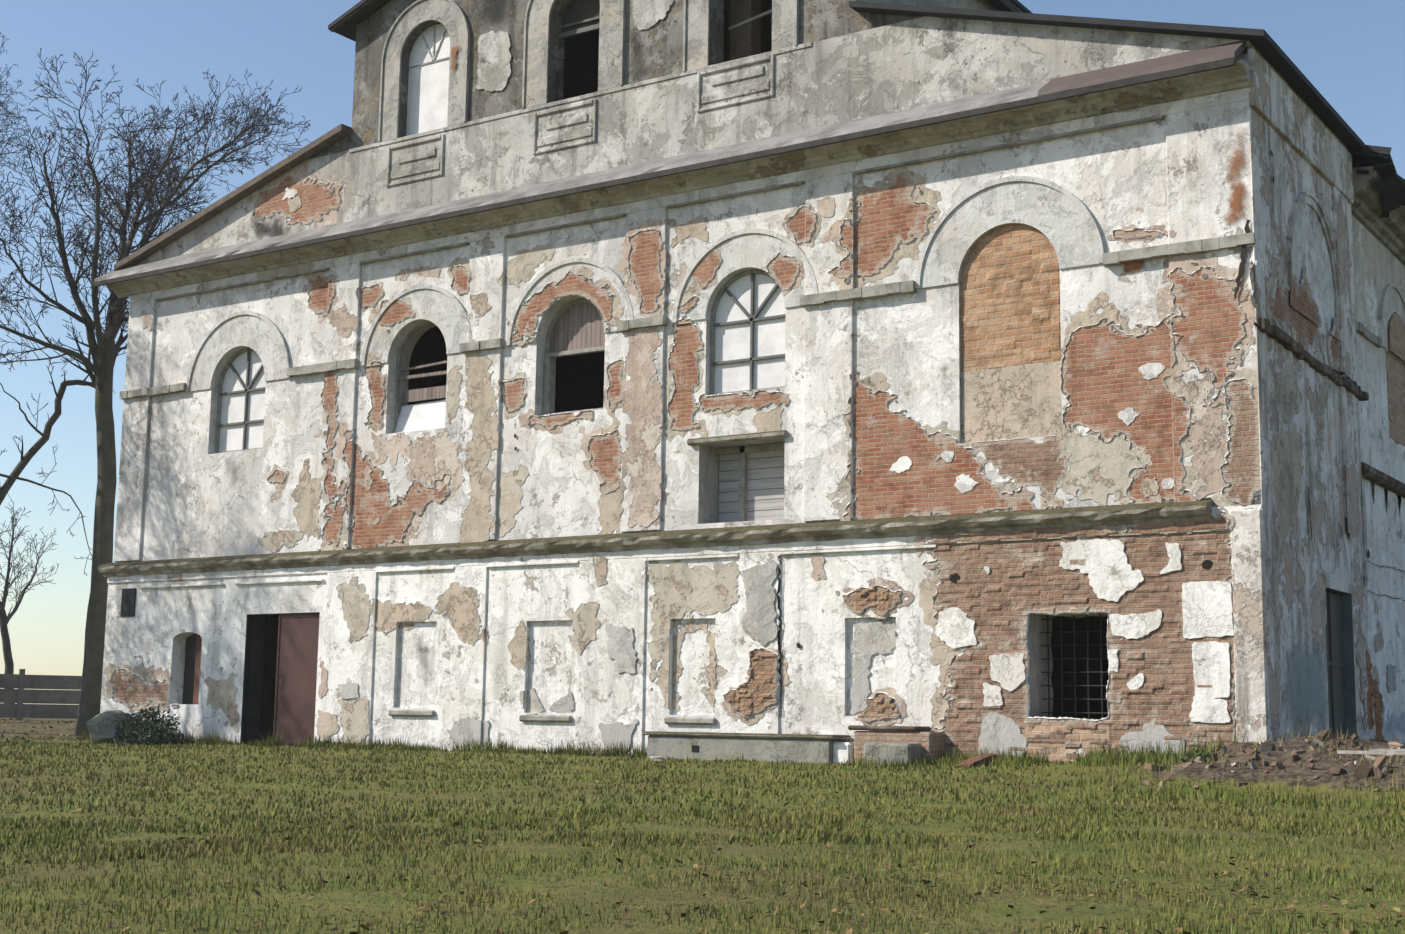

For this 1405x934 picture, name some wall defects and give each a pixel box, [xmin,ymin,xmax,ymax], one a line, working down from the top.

flaking render [245,159,347,229]
flaking render [764,167,945,296]
flaking render [1107,224,1176,242]
flaking render [257,216,791,552]
flaking render [811,252,1343,763]
flaking render [104,655,180,715]
peeling [204,672,240,733]
peeling [336,576,489,646]
peeling [508,620,532,671]
peeling [565,553,608,655]
peeling [642,554,801,726]
spalling [1353,604,1385,741]